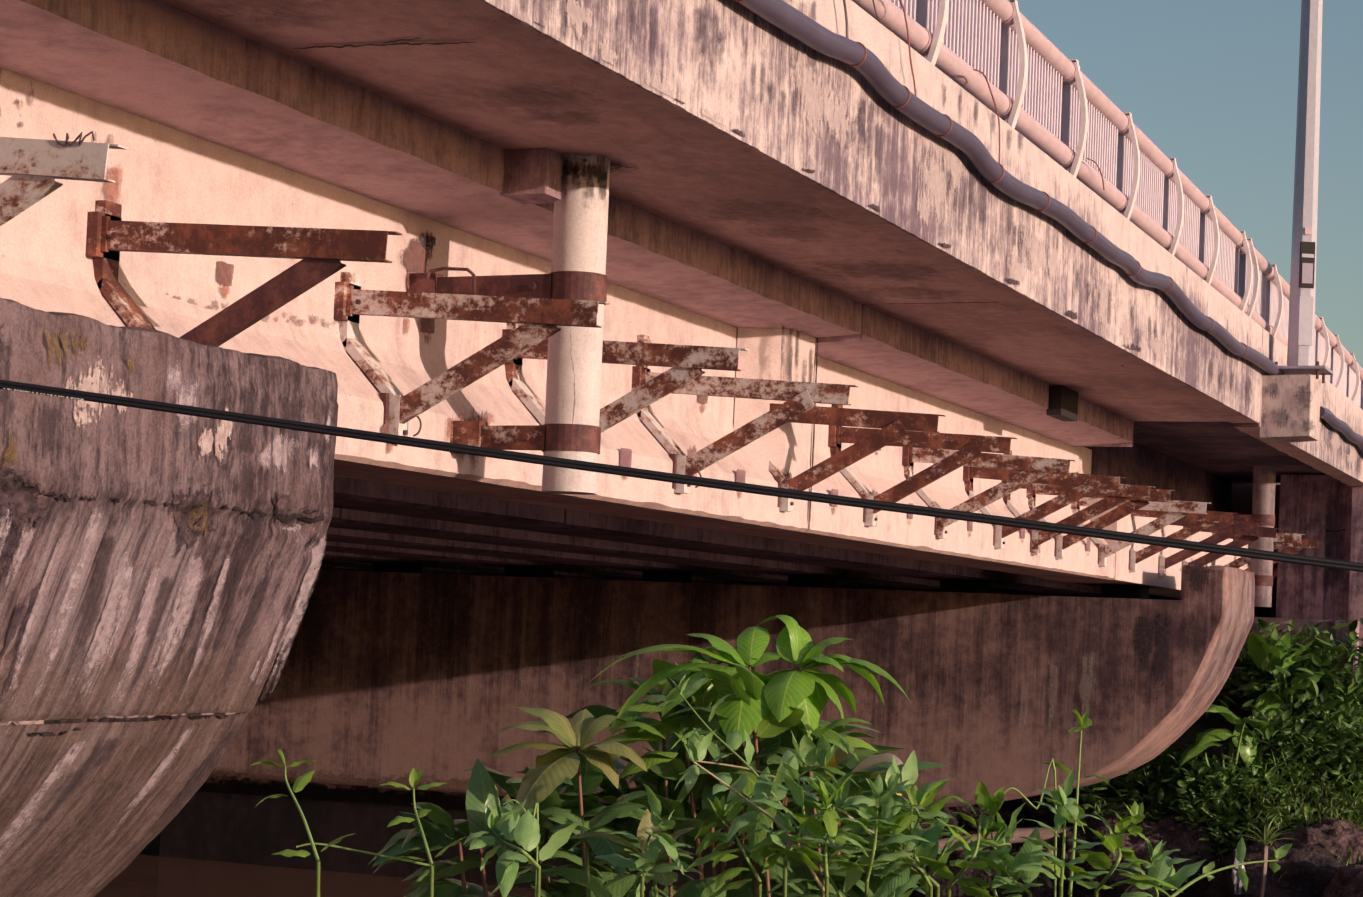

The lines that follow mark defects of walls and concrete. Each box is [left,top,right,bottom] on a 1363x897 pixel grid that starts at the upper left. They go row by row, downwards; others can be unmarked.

rust [217,261,234,298]
rust [400,233,440,290]
rust [405,318,435,342]
peeling [65,356,133,426]
spalling [0,434,48,574]
rust [620,448,632,479]
rust [736,469,746,497]
damp [0,510,33,579]
damp [48,514,270,691]
damp [251,536,333,681]
damp [0,739,117,857]
damp [120,729,191,820]